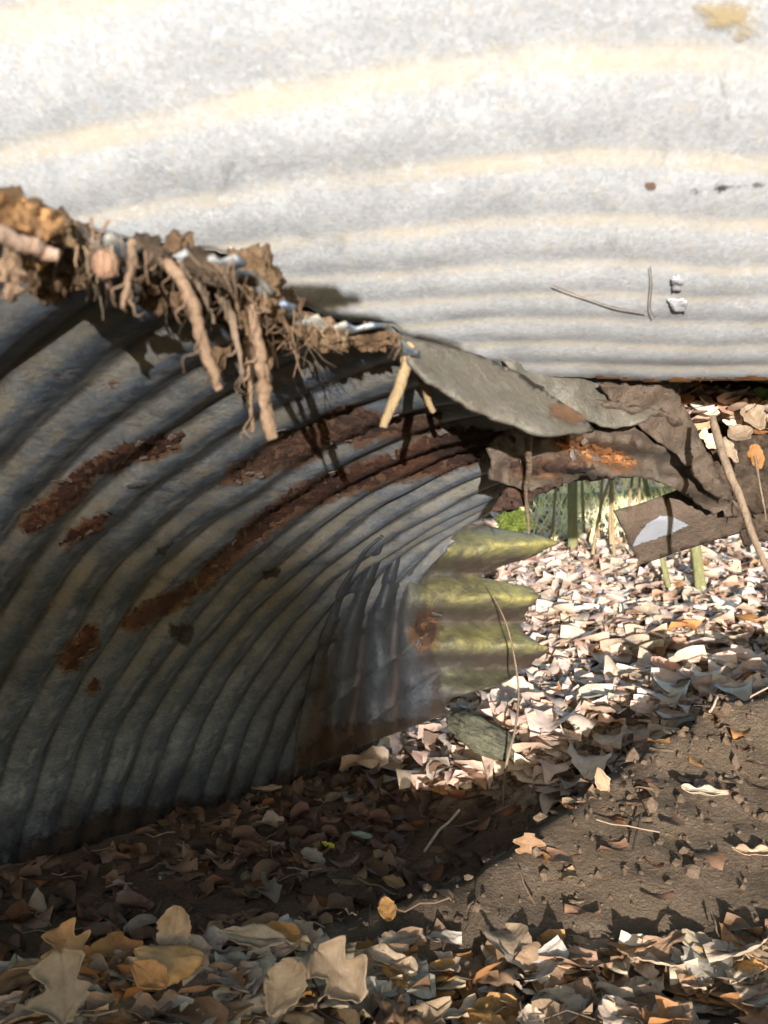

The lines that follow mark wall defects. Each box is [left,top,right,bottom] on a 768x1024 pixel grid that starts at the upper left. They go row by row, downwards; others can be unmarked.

rust [58,511,111,547]
rust [18,431,185,534]
rust [118,404,498,632]
rust [491,404,638,513]
rust [53,623,101,673]